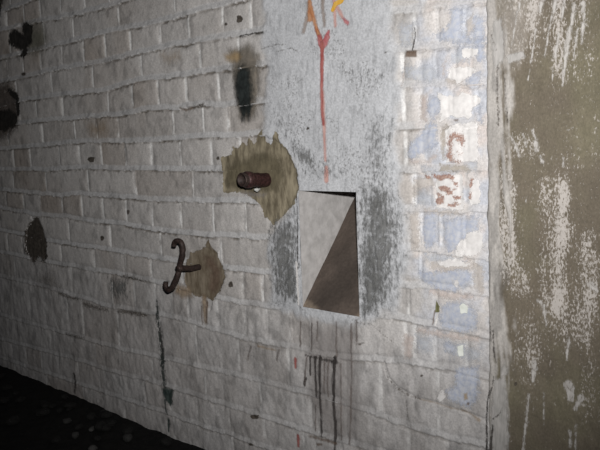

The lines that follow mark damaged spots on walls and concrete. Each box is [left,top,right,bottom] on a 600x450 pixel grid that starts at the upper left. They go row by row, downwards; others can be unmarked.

peeling [176,239,226,322]
peeling [221,129,299,225]
leakage [268,213,298,302]
leakage [359,175,400,315]
peeling [404,8,525,408]
leakage [303,322,350,450]
peeling [490,365,510,450]